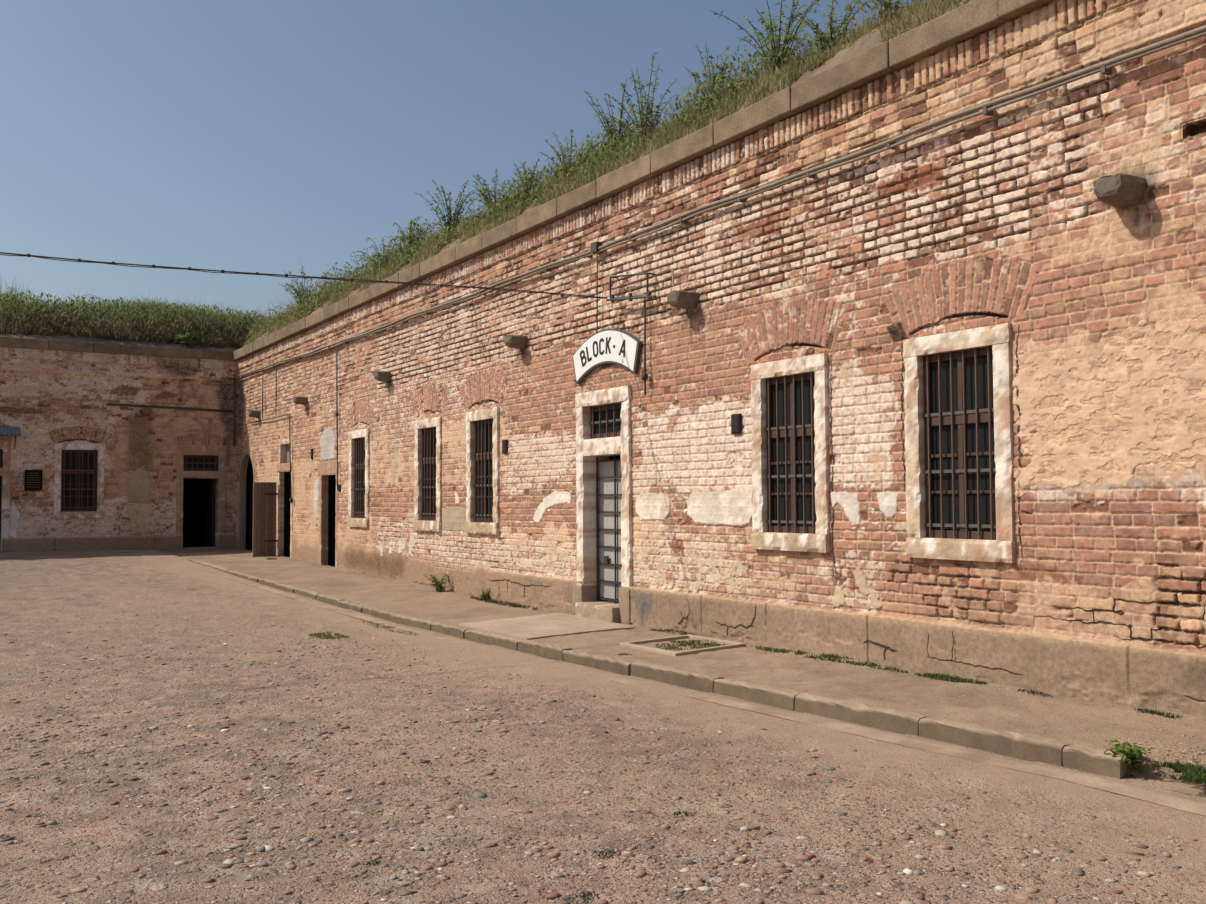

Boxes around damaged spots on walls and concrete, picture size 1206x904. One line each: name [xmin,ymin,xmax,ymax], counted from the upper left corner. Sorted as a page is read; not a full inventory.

flaking render [373,528,417,558]
flaking render [479,540,575,579]
flaking render [634,540,757,597]
flaking render [829,563,884,614]
spalling [1012,563,1067,582]
crack [717,605,756,634]
crack [1050,589,1206,648]
crack [863,640,896,659]
crack [927,632,1023,675]